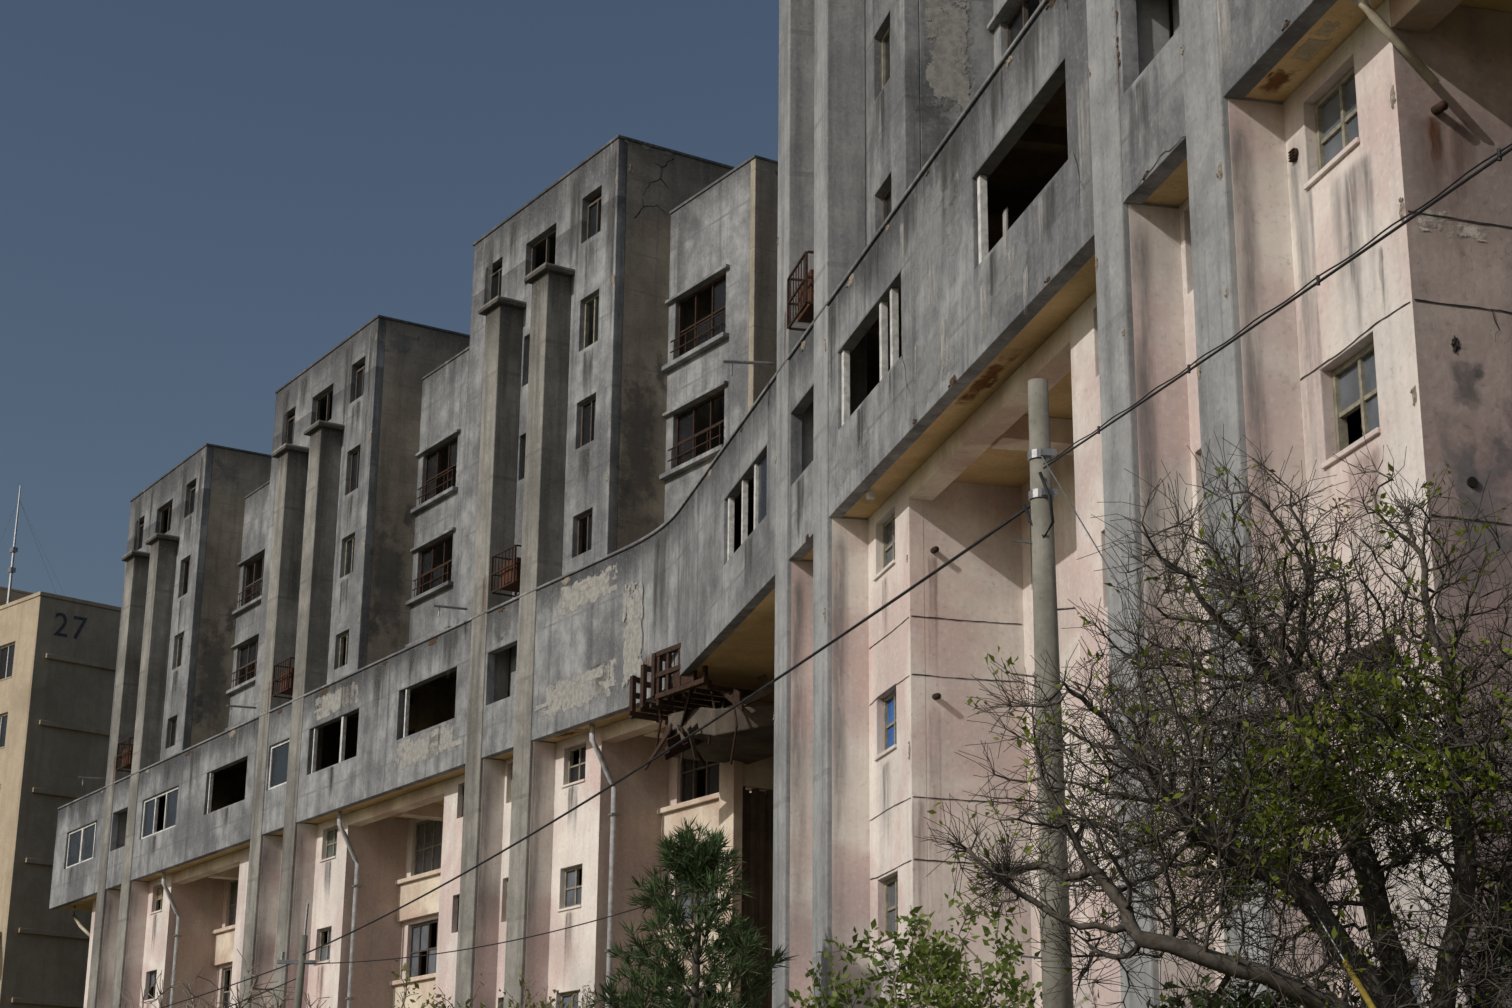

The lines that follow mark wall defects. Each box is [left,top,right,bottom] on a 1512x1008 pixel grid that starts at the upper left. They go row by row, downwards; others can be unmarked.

peeling [925,0,974,112]
crack [634,159,674,218]
peeling [534,563,643,720]